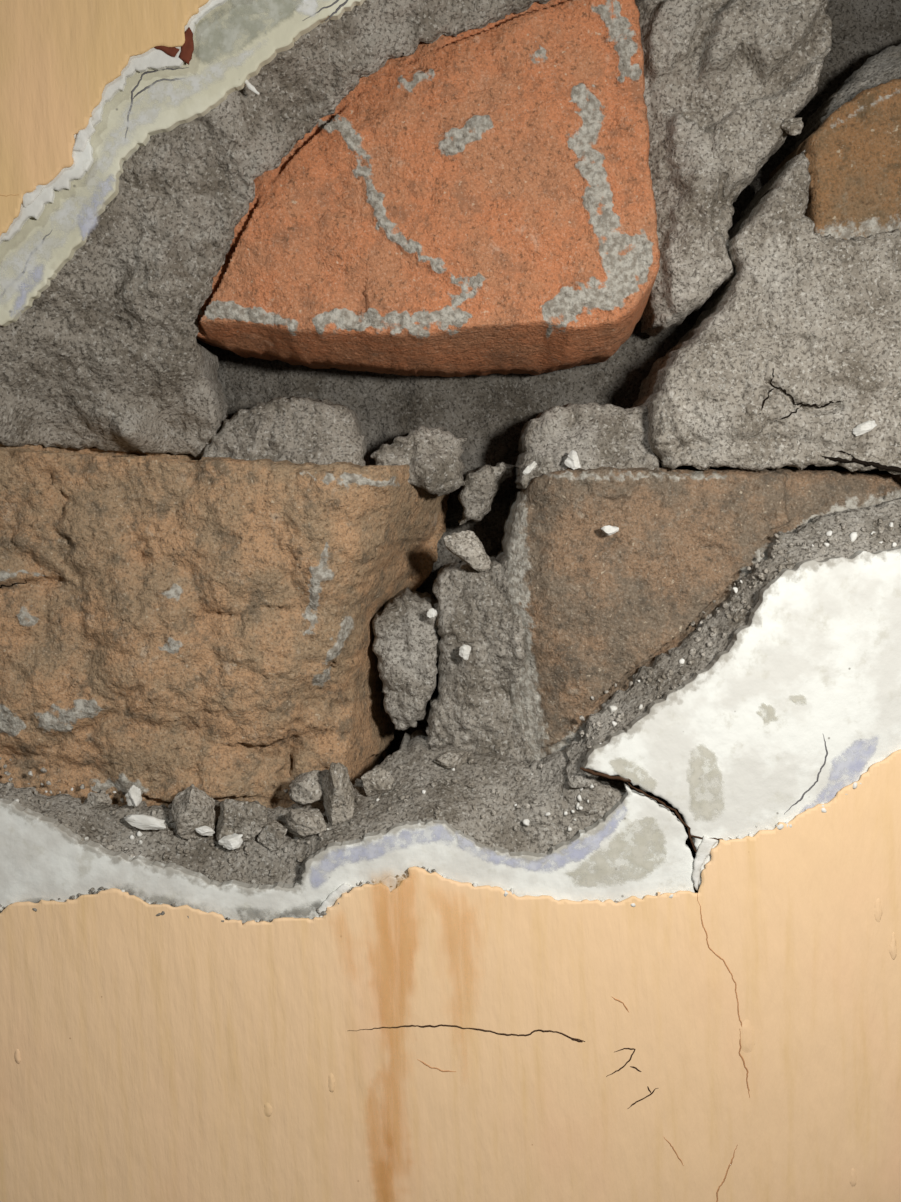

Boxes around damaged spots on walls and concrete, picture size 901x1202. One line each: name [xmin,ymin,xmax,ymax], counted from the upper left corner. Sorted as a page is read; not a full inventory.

flaking render [0,0,365,327]
peeling [852,420,877,436]
peeling [522,461,537,475]
peeling [564,450,581,470]
peeling [601,525,619,536]
flaking render [0,545,901,923]
crack [580,767,722,852]
crack [697,894,750,1098]
crack [348,1024,585,1042]
crack [417,1059,456,1072]
crack [606,1048,658,1109]
crack [716,1147,737,1202]